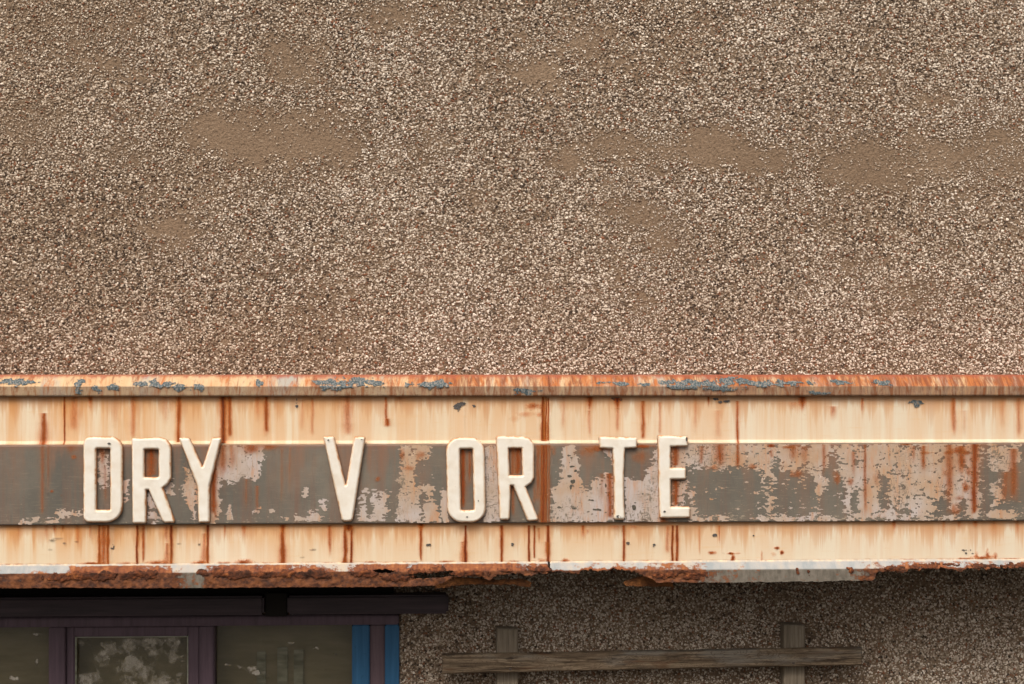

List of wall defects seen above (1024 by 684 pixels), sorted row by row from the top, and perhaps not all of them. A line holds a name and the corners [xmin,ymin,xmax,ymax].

peeling [74,379,119,394]
peeling [133,379,205,392]
peeling [596,376,855,403]
corrosion [39,413,47,445]
corrosion [637,401,649,448]
peeling [164,445,267,524]
peeling [252,487,329,522]
peeling [355,445,450,523]
peeling [547,437,1023,522]
corrosion [41,525,173,582]
corrosion [652,518,708,580]
corrosion [884,553,1024,571]